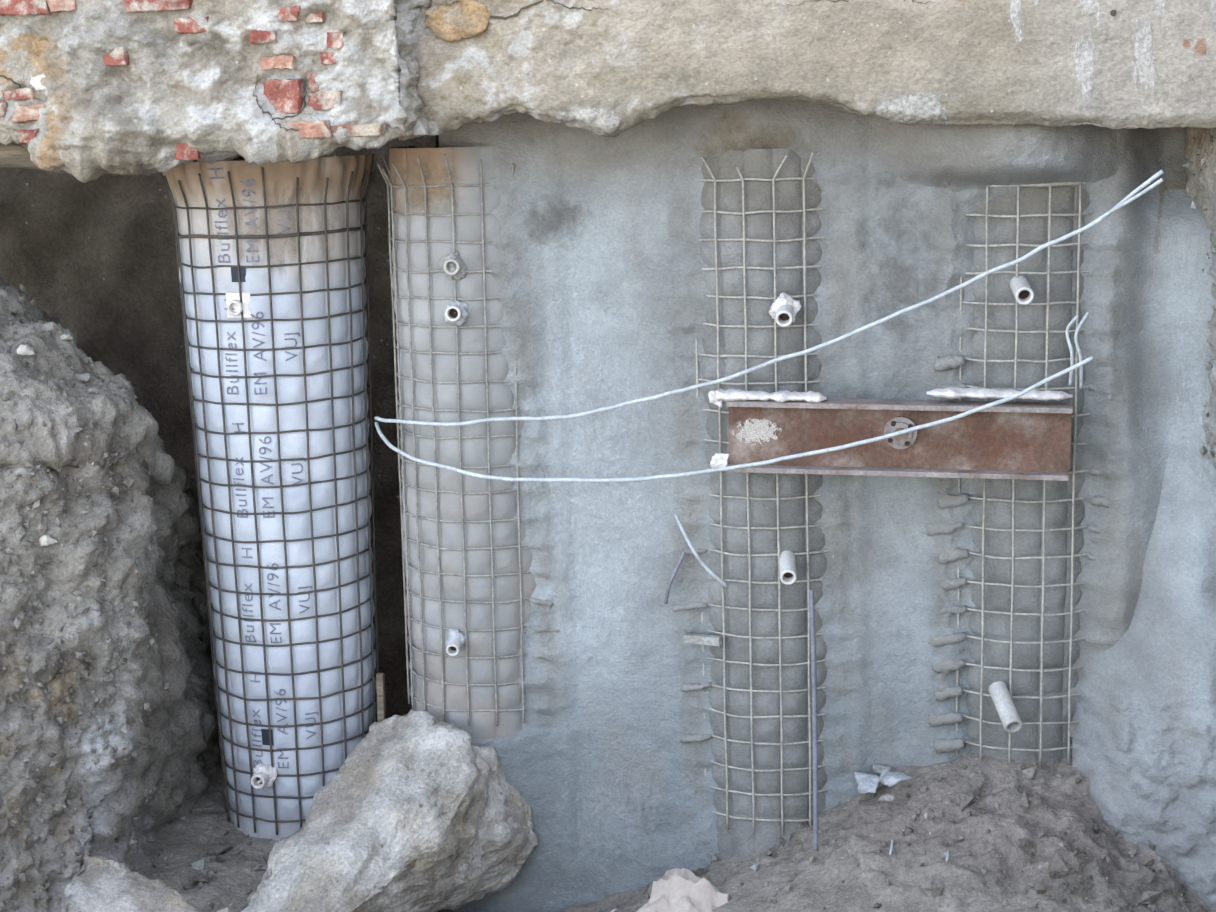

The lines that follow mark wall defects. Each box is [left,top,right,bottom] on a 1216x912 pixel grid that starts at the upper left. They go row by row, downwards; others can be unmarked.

spalling [0,0,76,16]
spalling [123,0,209,34]
crack [490,0,608,20]
water stain [1010,0,1038,41]
spalling [103,47,130,66]
water stain [1074,38,1094,112]
water stain [1132,0,1166,105]
spalling [0,87,46,145]
spalling [175,143,205,160]
spalling [0,167,203,503]
spalling [249,5,439,719]
rust [817,431,855,453]